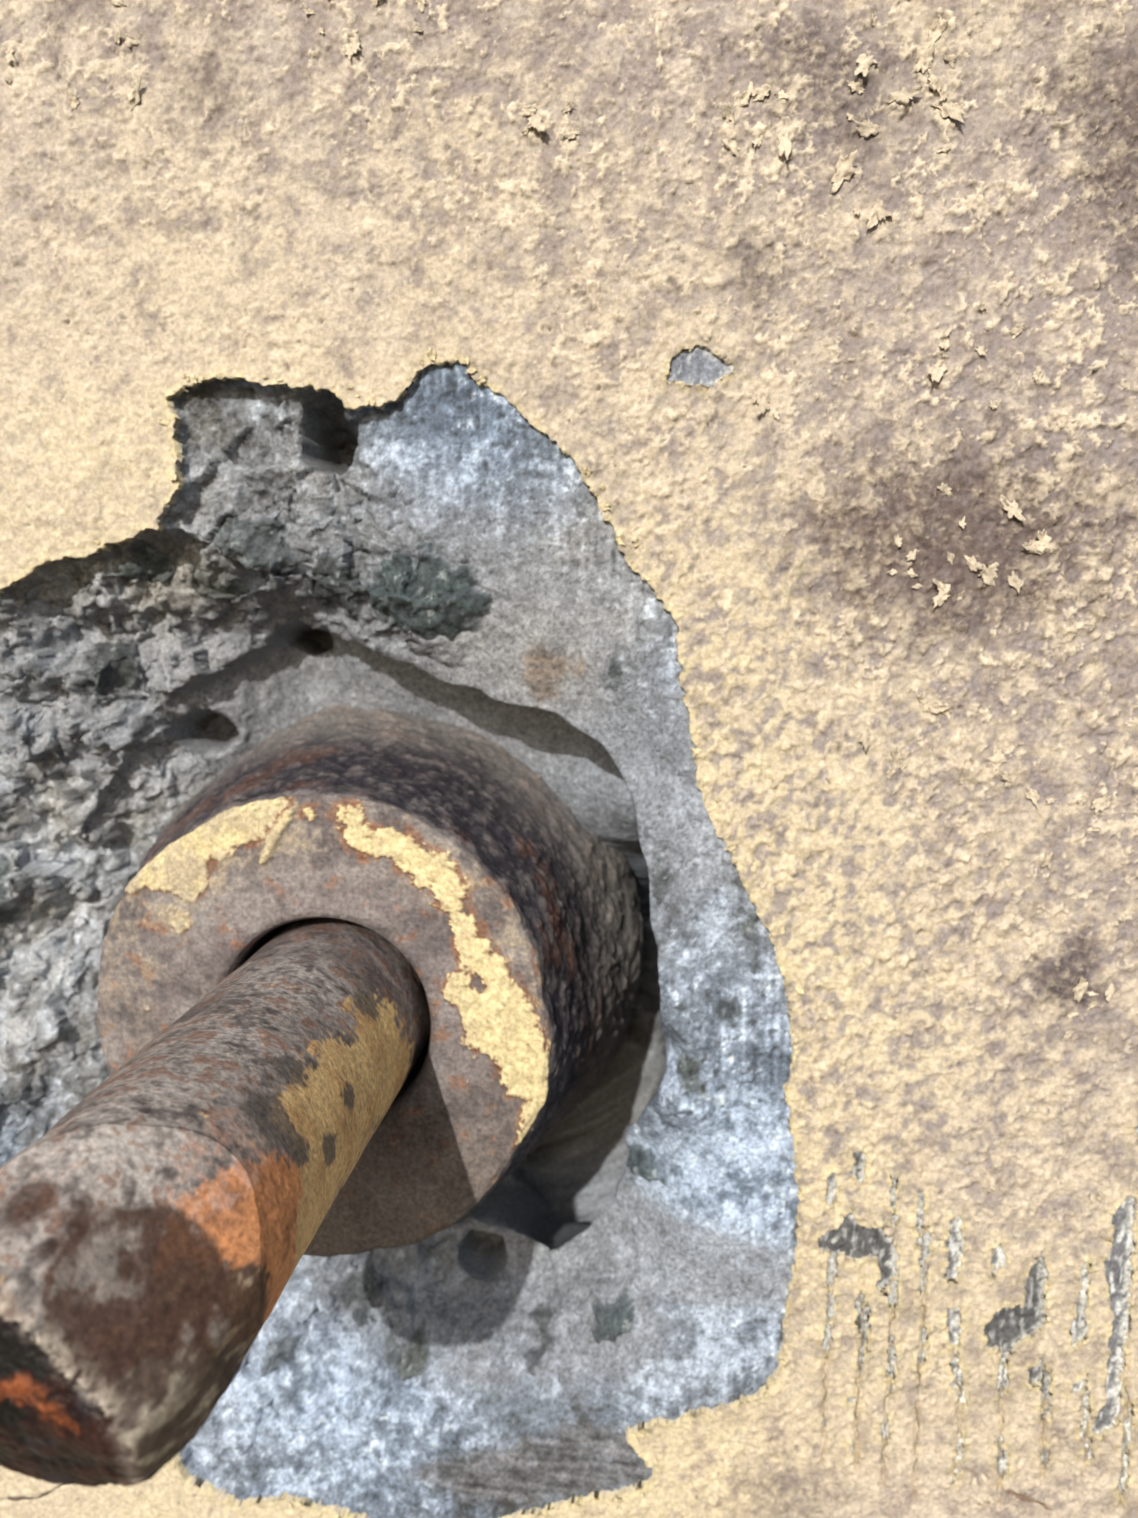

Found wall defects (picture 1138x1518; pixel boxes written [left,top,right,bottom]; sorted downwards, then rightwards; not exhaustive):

peeling [927,328,951,383]
peeling [887,535,964,608]
peeling [937,482,953,497]
peeling [947,552,1024,593]
peeling [999,494,1053,555]
spalling [0,346,807,1518]
peeling [1061,976,1115,1042]
peeling [818,1150,898,1377]
peeling [916,1192,964,1296]
peeling [946,1308,966,1408]
peeling [983,1252,1048,1398]
peeling [1069,1192,1135,1494]